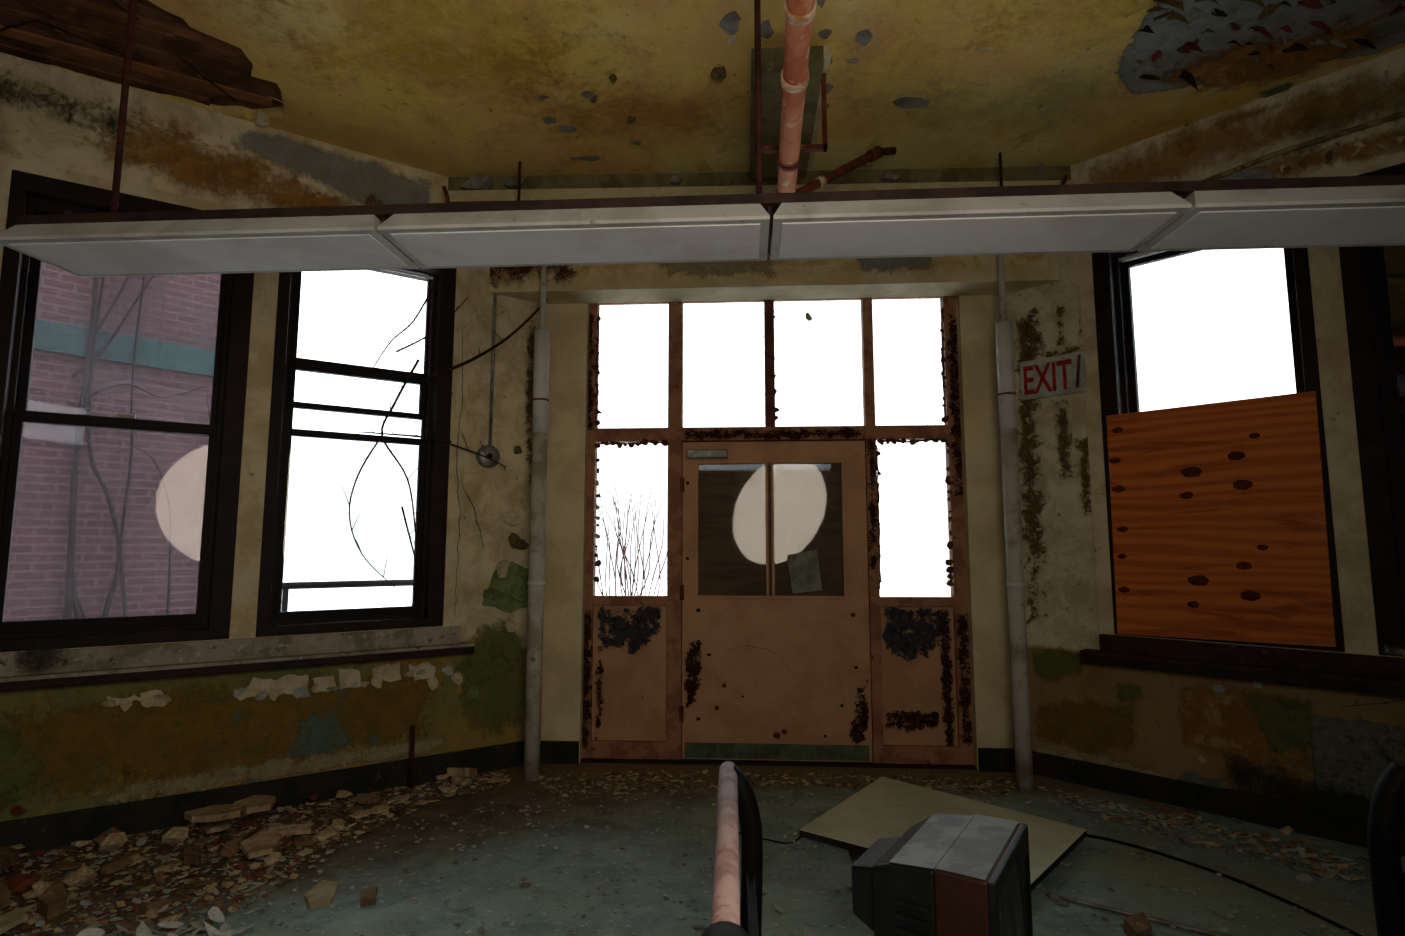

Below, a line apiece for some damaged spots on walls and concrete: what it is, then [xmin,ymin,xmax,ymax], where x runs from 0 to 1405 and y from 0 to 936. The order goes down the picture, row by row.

leakage [0,80,351,208]
spalling [0,0,430,205]
peeling [710,66,727,82]
peeling [719,11,741,46]
peeling [830,29,873,64]
peeling [892,97,931,109]
leakage [1090,73,1405,184]
peeling [1115,0,1405,99]
peeling [482,509,529,649]
peeling [100,689,172,712]
leakage [9,659,434,805]
peeling [233,662,480,701]